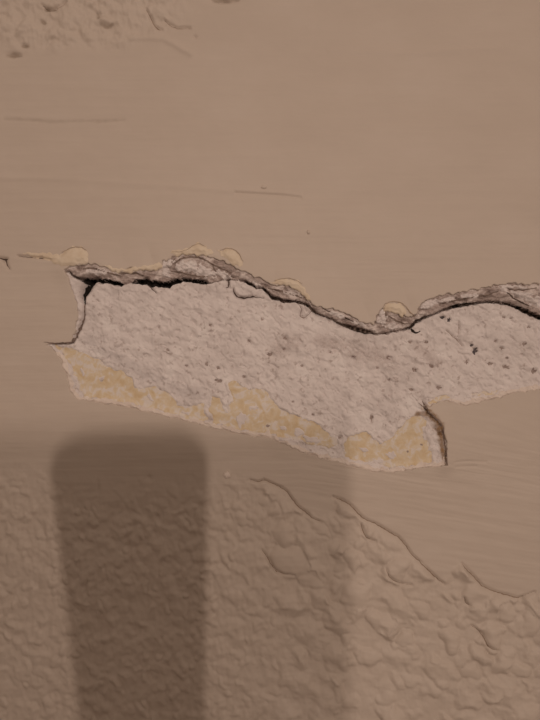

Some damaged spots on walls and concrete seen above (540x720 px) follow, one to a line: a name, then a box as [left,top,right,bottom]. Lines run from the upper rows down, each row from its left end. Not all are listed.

spalling [24,242,540,472]
crack [45,256,540,345]